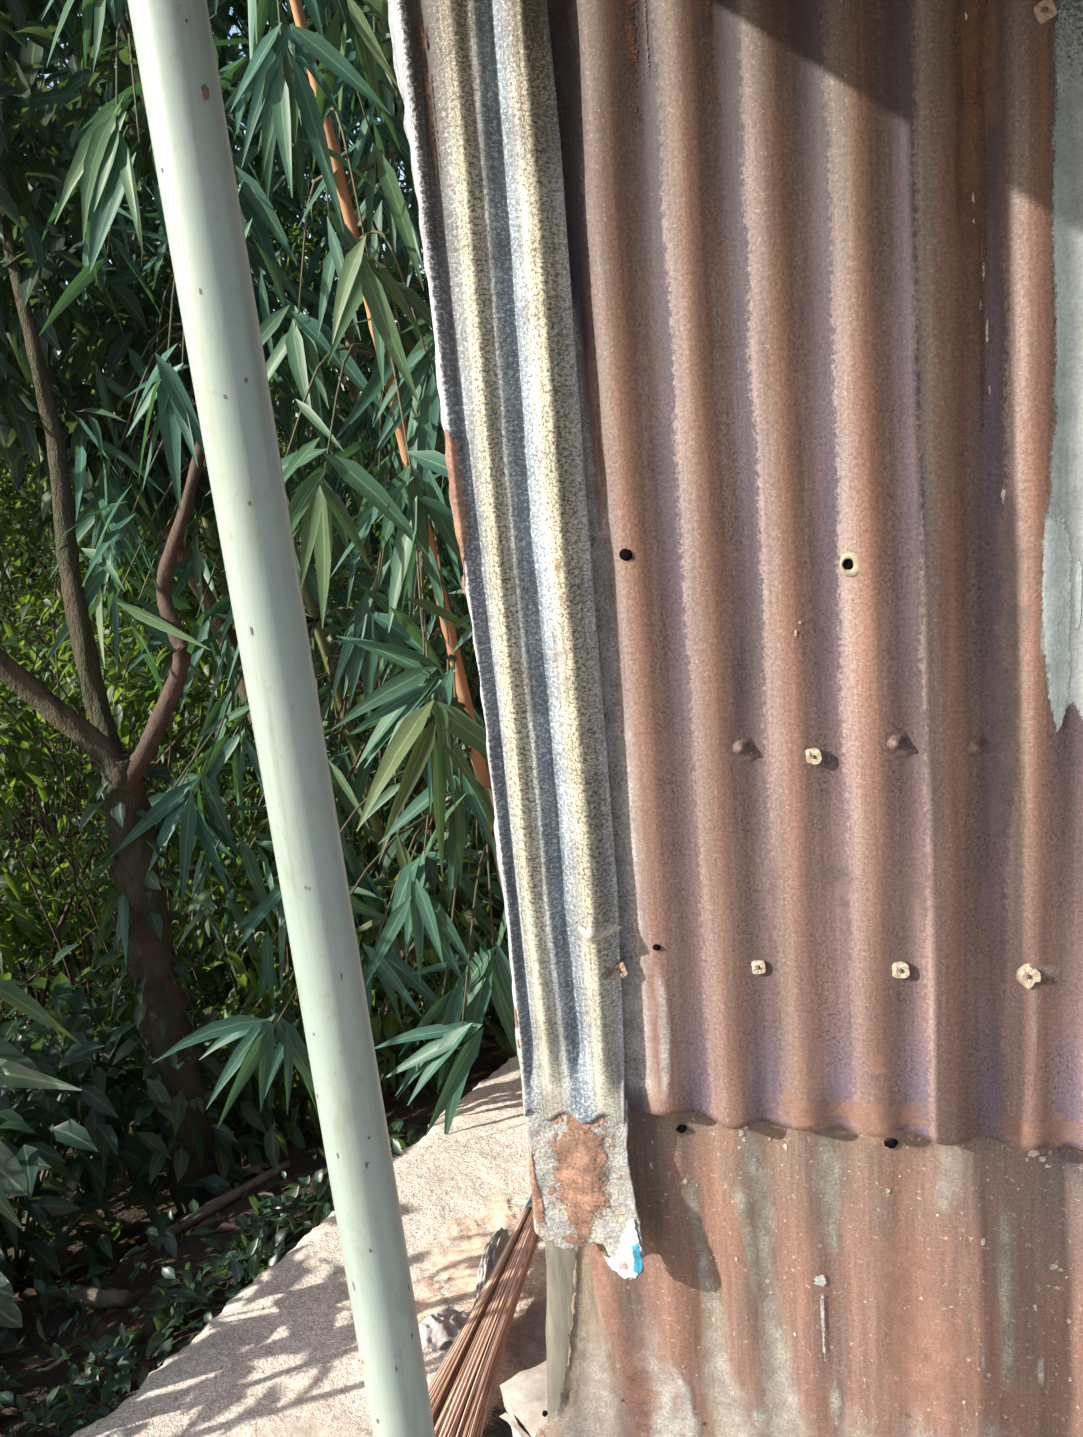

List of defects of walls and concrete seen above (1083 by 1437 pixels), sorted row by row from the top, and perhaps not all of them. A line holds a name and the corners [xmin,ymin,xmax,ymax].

rust [547,0,569,191]
peeling [1040,0,1083,732]
rust [573,309,669,1091]
rust [413,1113,698,1437]
water stain [687,1185,750,1437]
water stain [737,1138,806,1437]
water stain [818,1140,840,1248]
rust [831,1382,855,1437]
water stain [998,1212,1012,1385]